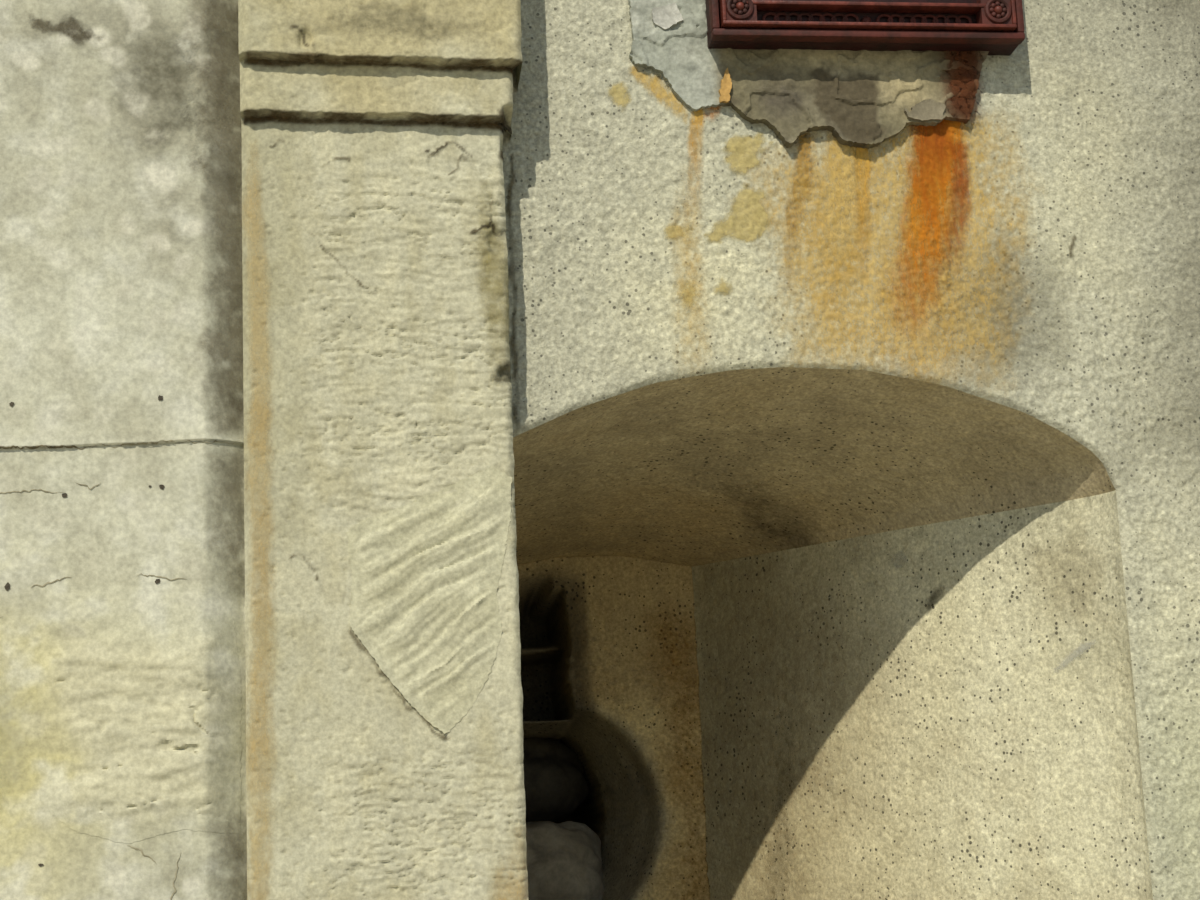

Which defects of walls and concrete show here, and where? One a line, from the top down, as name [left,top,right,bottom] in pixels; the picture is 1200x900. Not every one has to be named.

peeling [628,0,989,174]
peeling [705,189,768,242]
corrosion [766,50,1023,376]
crack [350,630,447,740]